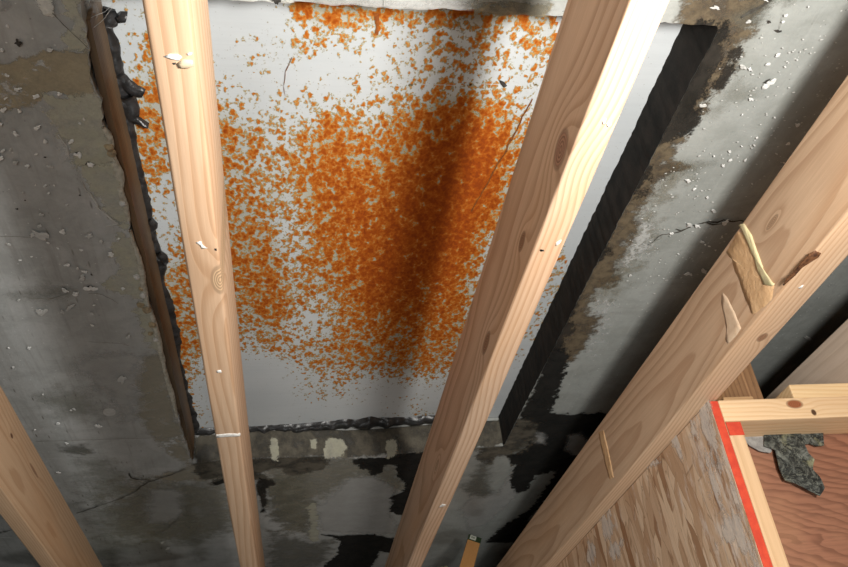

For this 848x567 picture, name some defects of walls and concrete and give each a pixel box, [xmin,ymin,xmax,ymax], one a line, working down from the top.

corrosion [119,32,209,428]
corrosion [215,1,558,416]
crack [652,219,744,243]
corrosion [524,246,568,340]
crack [78,469,186,513]
damp [256,452,423,567]